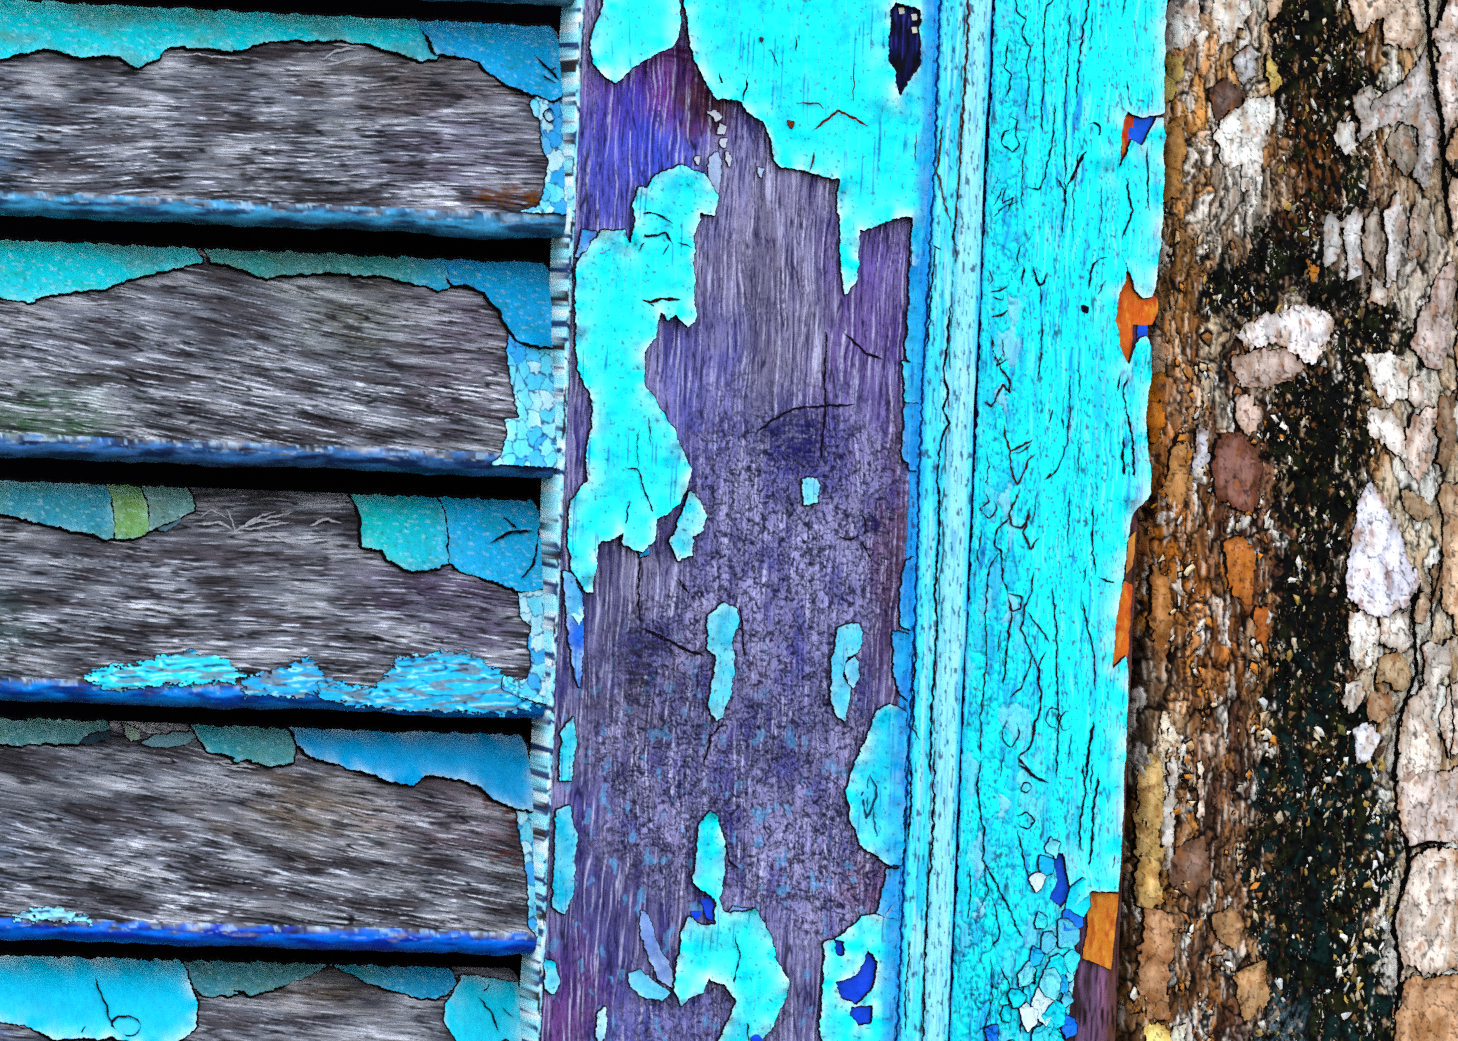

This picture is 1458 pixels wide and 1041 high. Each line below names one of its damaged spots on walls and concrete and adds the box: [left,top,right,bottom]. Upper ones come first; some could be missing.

crack [799,66,868,172]
crack [756,331,883,461]
peeling [0,0,934,937]
crack [861,0,1150,1041]
peeling [817,556,914,1041]
peeling [0,951,522,1041]
peeling [543,957,561,995]
peeling [593,1005,608,1041]
peeling [627,810,791,1041]
peeling [983,877,1091,1041]
peeling [1027,836,1061,893]